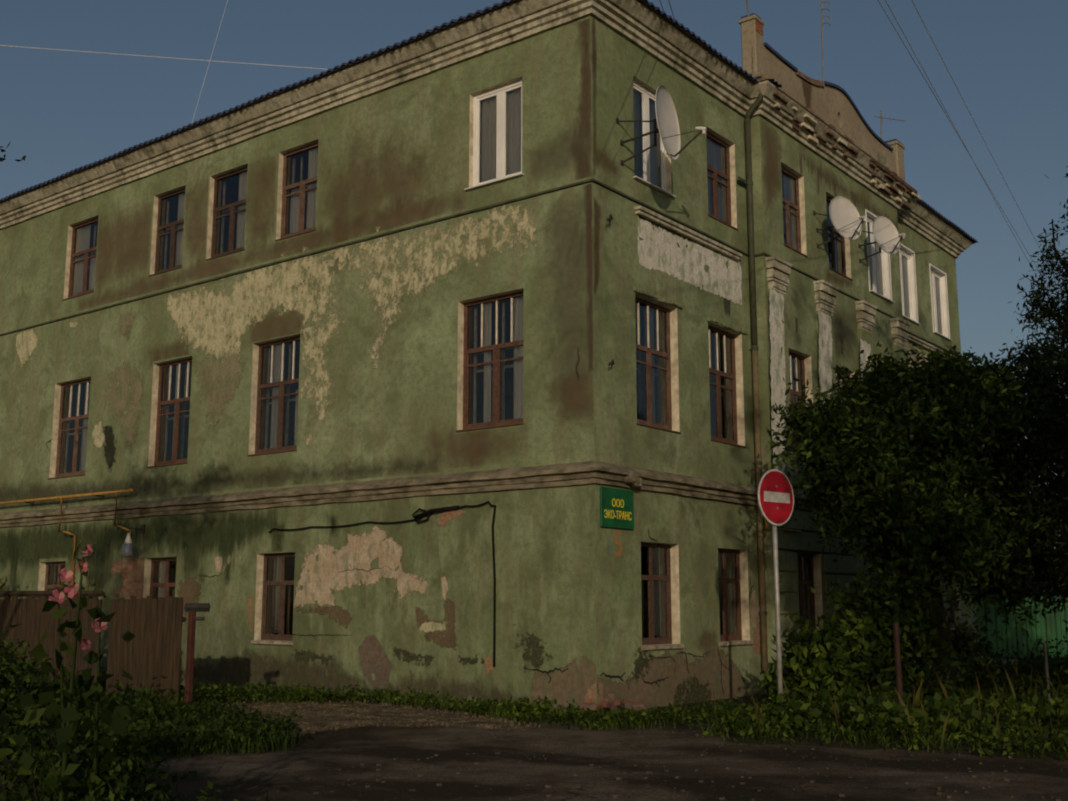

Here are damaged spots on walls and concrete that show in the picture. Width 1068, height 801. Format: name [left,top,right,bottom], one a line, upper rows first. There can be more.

spalling [752,72,921,210]
peeling [637,216,742,305]
peeling [15,329,38,367]
peeling [164,204,540,447]
peeling [769,287,786,474]
peeling [818,310,833,408]
peeling [860,338,871,384]
flaking render [112,556,144,599]
peeling [294,526,456,650]
crack [524,668,569,683]
crack [600,646,730,698]